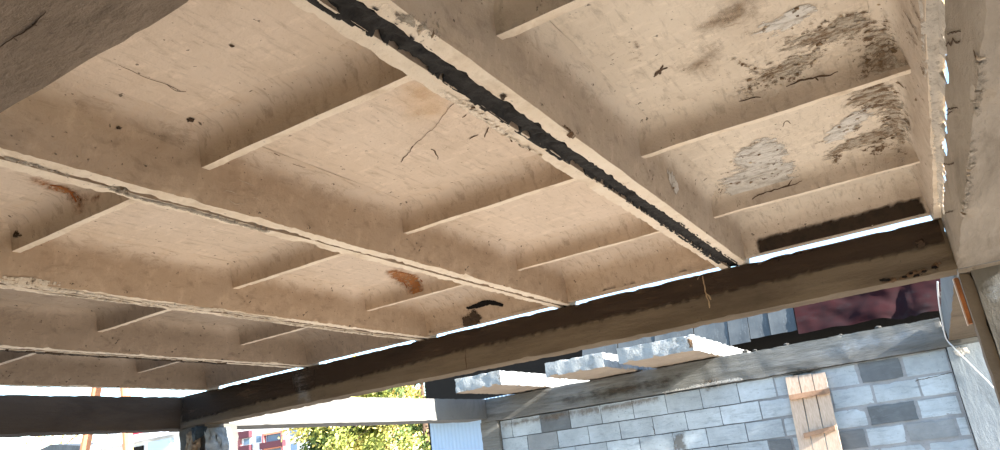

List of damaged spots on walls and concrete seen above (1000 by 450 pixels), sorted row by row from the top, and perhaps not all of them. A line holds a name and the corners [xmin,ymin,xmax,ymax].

crack [786,71,838,87]
peeling [732,1,924,165]
crack [401,104,489,162]
corrosion [35,181,82,204]
damp [182,0,947,422]
peeling [715,134,796,198]
corrosion [388,270,423,294]